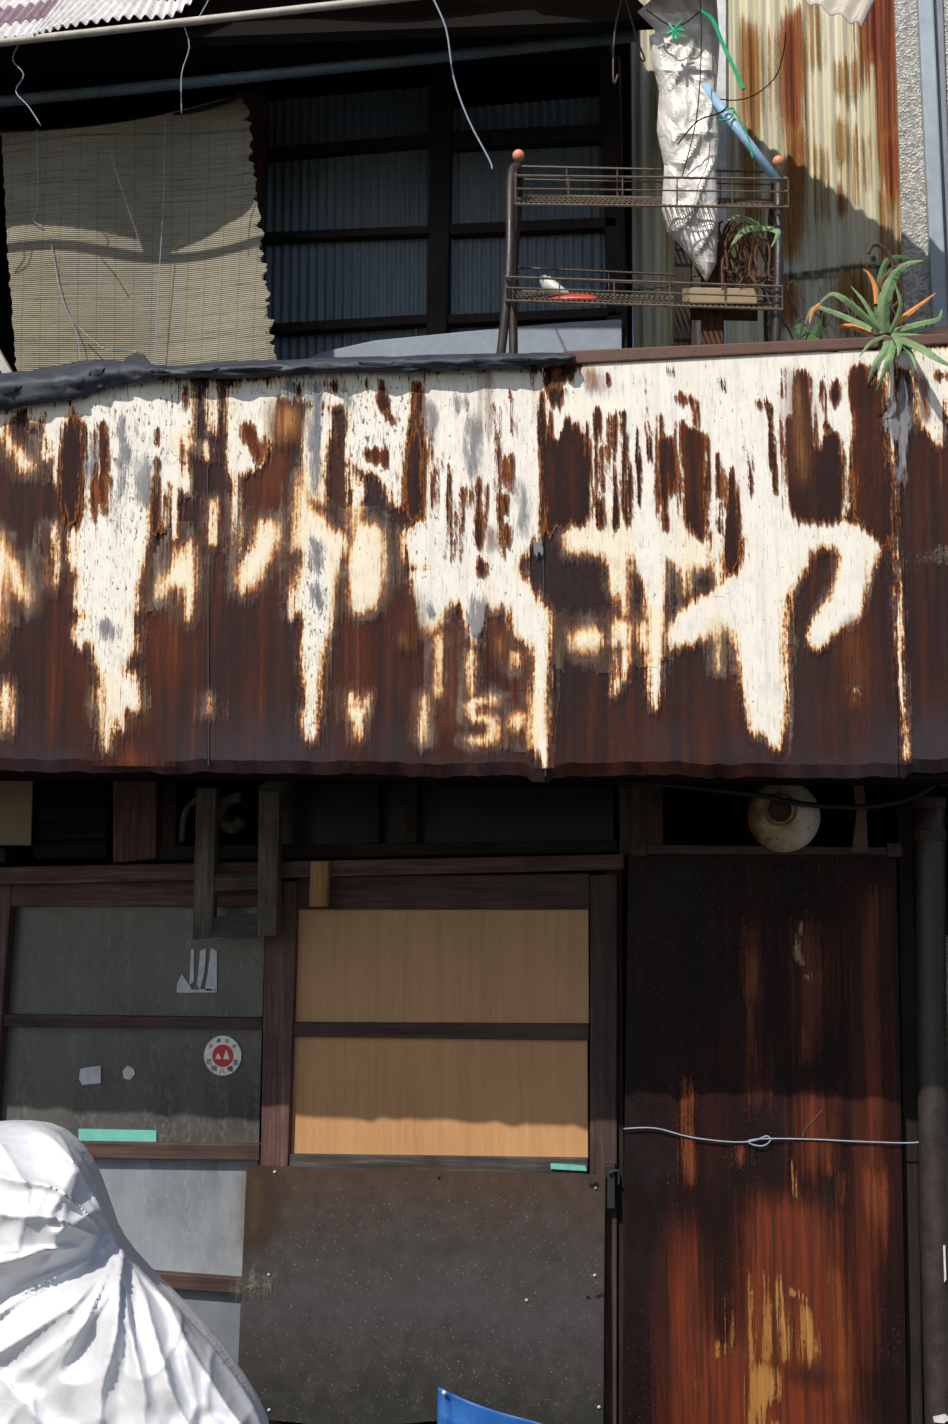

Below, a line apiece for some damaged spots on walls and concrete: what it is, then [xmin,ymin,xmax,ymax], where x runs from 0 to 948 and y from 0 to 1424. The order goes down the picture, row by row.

rust [654,75,664,168]
rust [735,0,904,338]
rust [178,381,193,410]
rust [56,410,167,536]
peeling [0,345,948,768]
rust [239,360,948,742]
rust [66,632,99,719]
rust [96,614,119,639]
rust [102,711,164,766]
rust [622,842,907,1424]